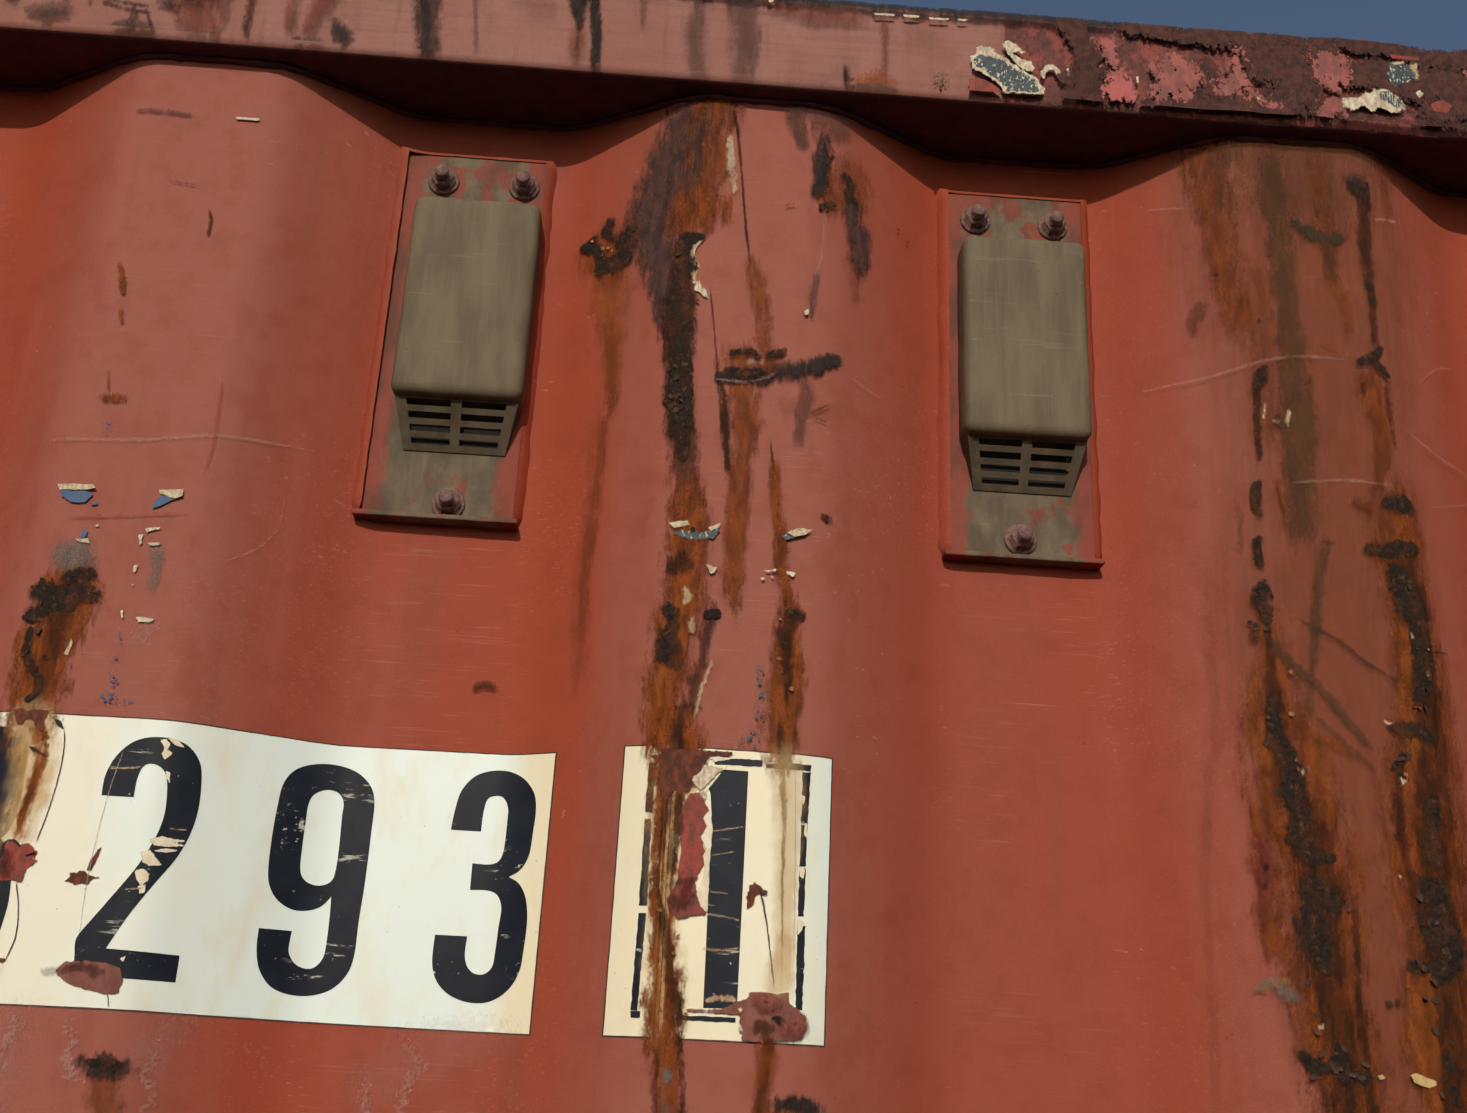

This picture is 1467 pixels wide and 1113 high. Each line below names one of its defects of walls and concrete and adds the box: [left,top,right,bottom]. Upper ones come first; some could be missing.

peeling [1303,44,1452,120]
peeling [58,483,97,505]
peeling [152,489,183,508]
rust [4,538,105,841]
rust [580,98,771,1113]
rust [761,441,808,942]
rust [1242,174,1467,1113]
peeling [666,764,726,919]
rust [76,1052,129,1081]
peeling [686,882,808,1113]
rust [775,1094,825,1113]